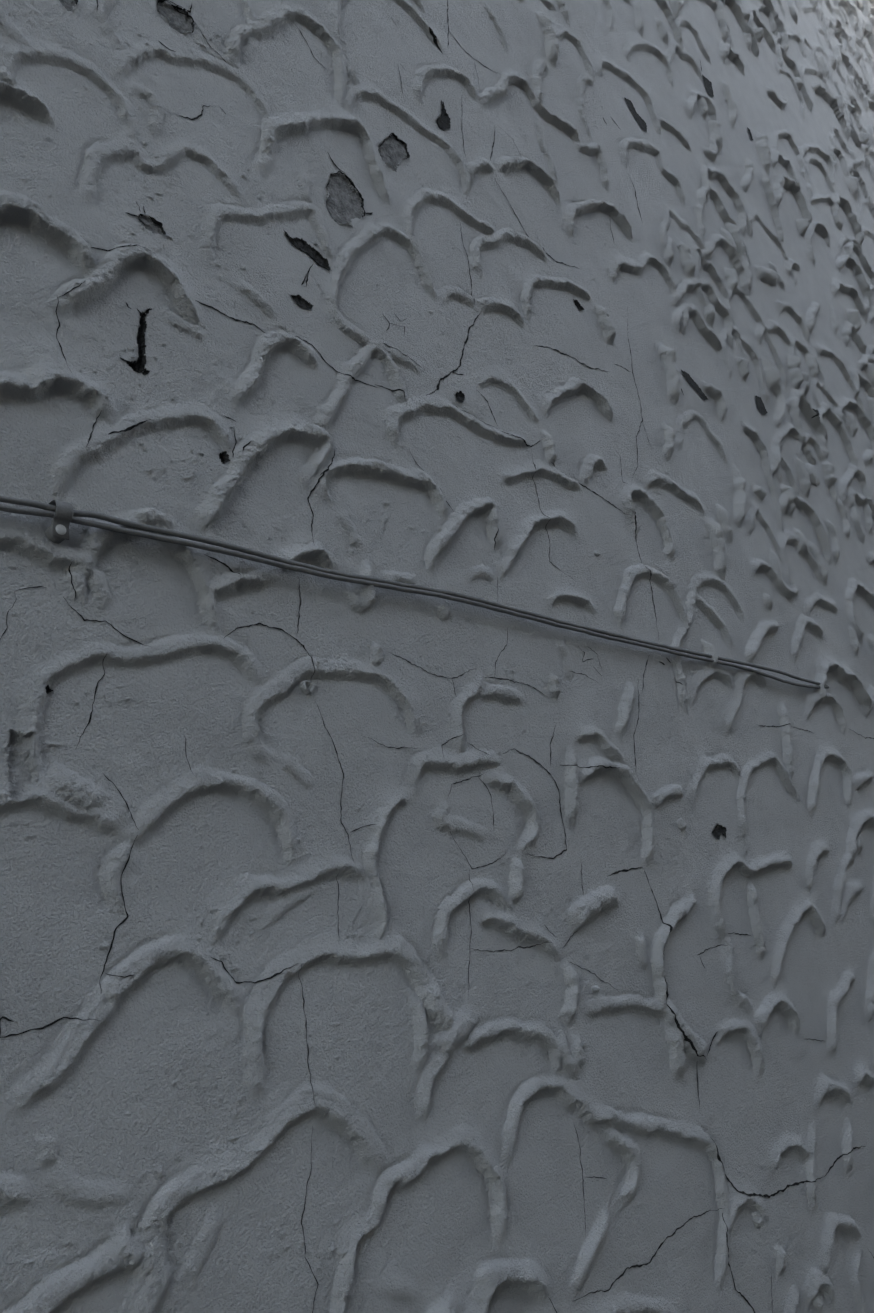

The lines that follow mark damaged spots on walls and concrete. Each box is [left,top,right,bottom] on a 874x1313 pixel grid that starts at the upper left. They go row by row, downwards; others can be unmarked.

flaking render [59,0,78,13]
flaking render [156,0,194,36]
flaking render [127,202,166,235]
flaking render [325,153,372,228]
flaking render [378,133,410,172]
crack [0,562,151,746]
crack [197,220,717,1105]
crack [0,775,138,1038]
crack [210,956,318,1313]
crack [548,1126,865,1313]